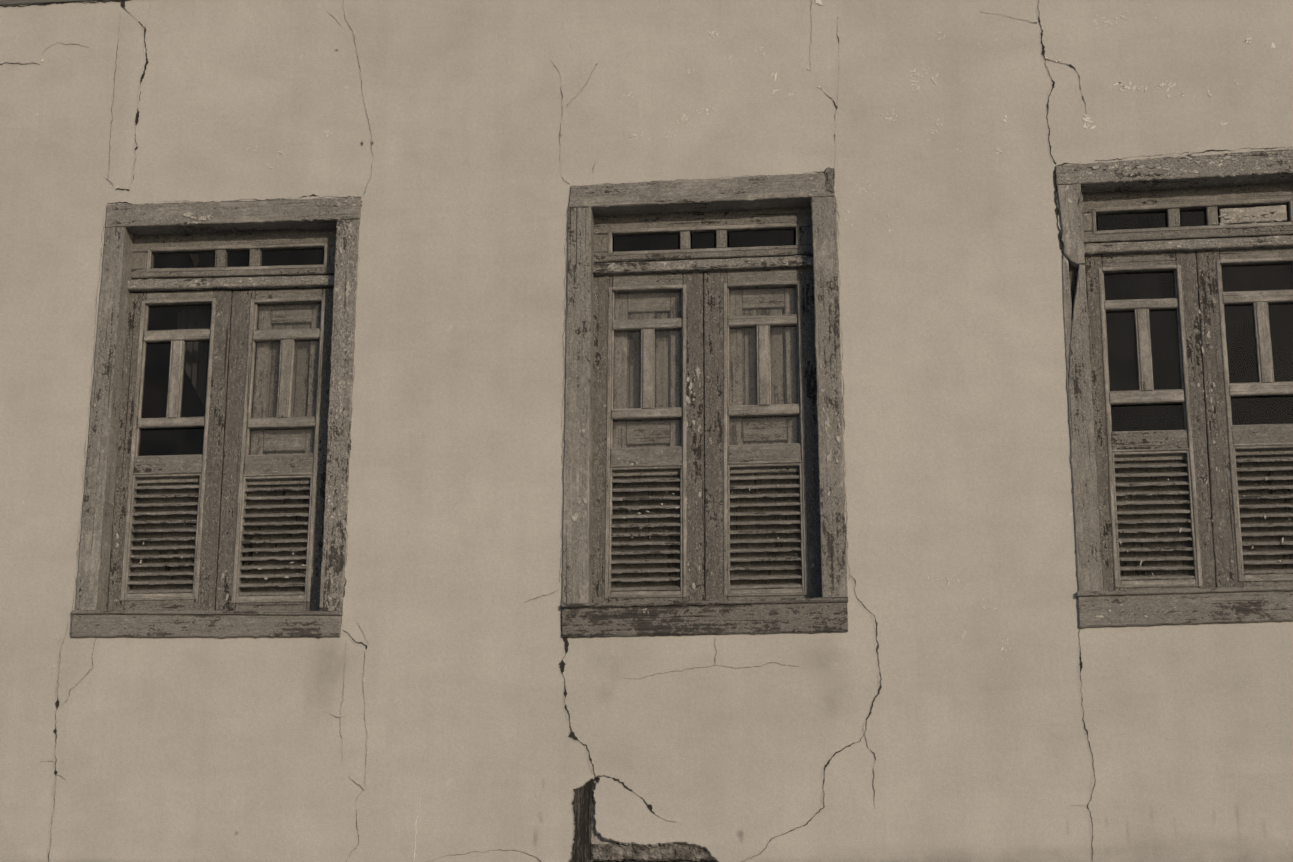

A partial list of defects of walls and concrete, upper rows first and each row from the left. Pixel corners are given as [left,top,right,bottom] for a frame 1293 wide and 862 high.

crack [0,0,172,193]
crack [323,0,374,195]
crack [807,0,840,161]
crack [981,0,1087,164]
crack [39,621,97,862]
crack [323,623,369,862]
crack [558,637,675,822]
flaking render [568,777,718,862]
crack [736,576,882,862]
crack [1072,627,1096,862]